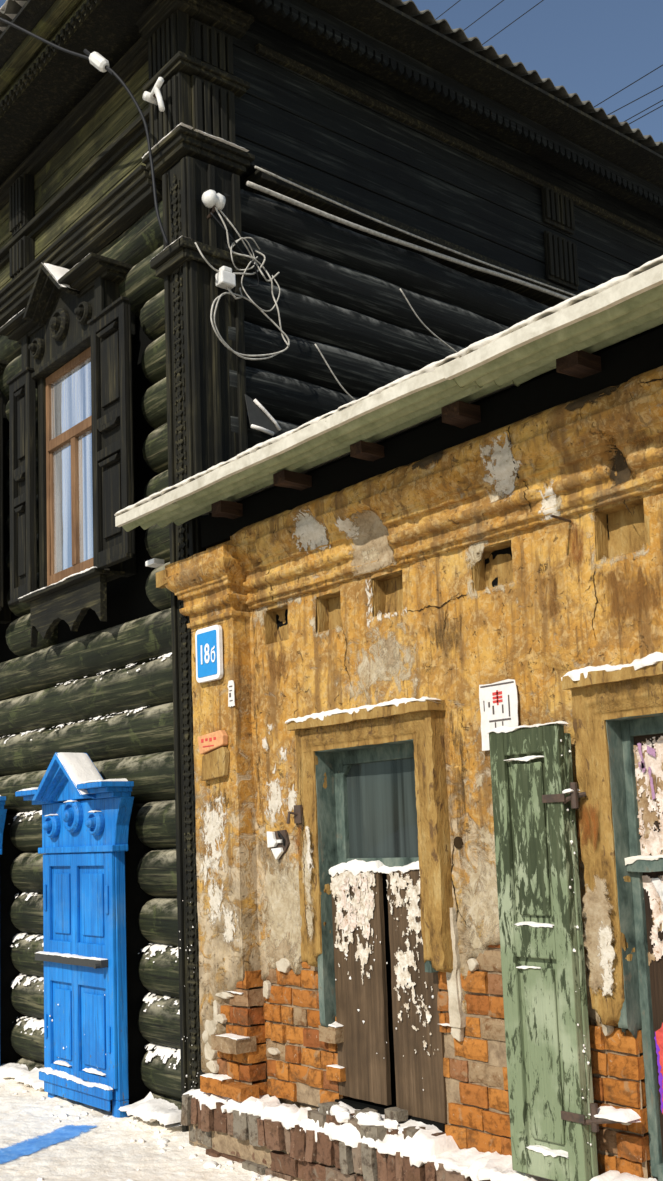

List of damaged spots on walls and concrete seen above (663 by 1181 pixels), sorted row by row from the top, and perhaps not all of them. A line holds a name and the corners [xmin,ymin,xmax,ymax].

spalling [480,432,522,503]
spalling [538,480,562,521]
spalling [292,508,418,705]
crack [585,571,606,638]
spalling [199,724,348,1107]
spalling [330,823,512,1156]
spalling [582,875,615,996]